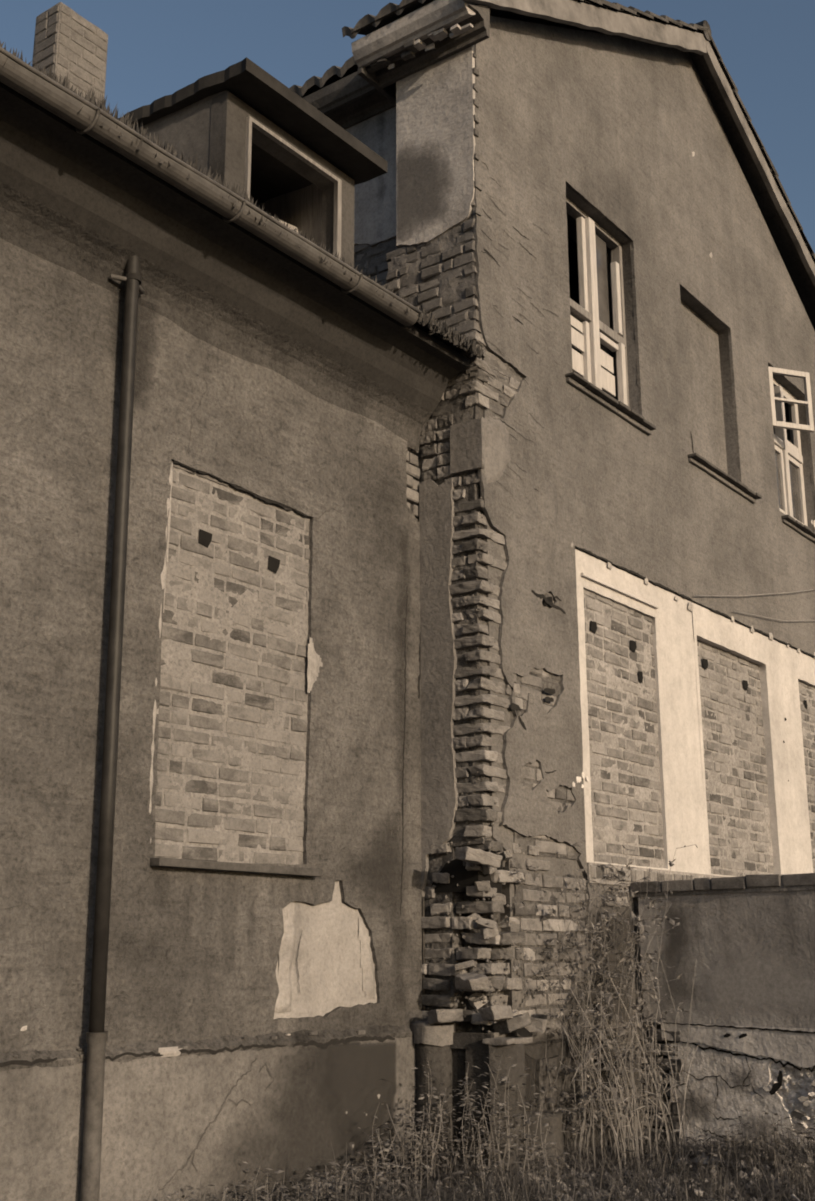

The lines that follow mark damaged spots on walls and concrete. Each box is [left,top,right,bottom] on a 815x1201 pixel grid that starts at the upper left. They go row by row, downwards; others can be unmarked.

leakage [397,153,445,239]
spalling [354,180,575,823]
flaking render [513,832,579,860]
flaking render [274,880,377,1019]
flaking render [512,871,630,1017]
crack [0,1025,395,1190]
flaking render [763,1059,815,1141]